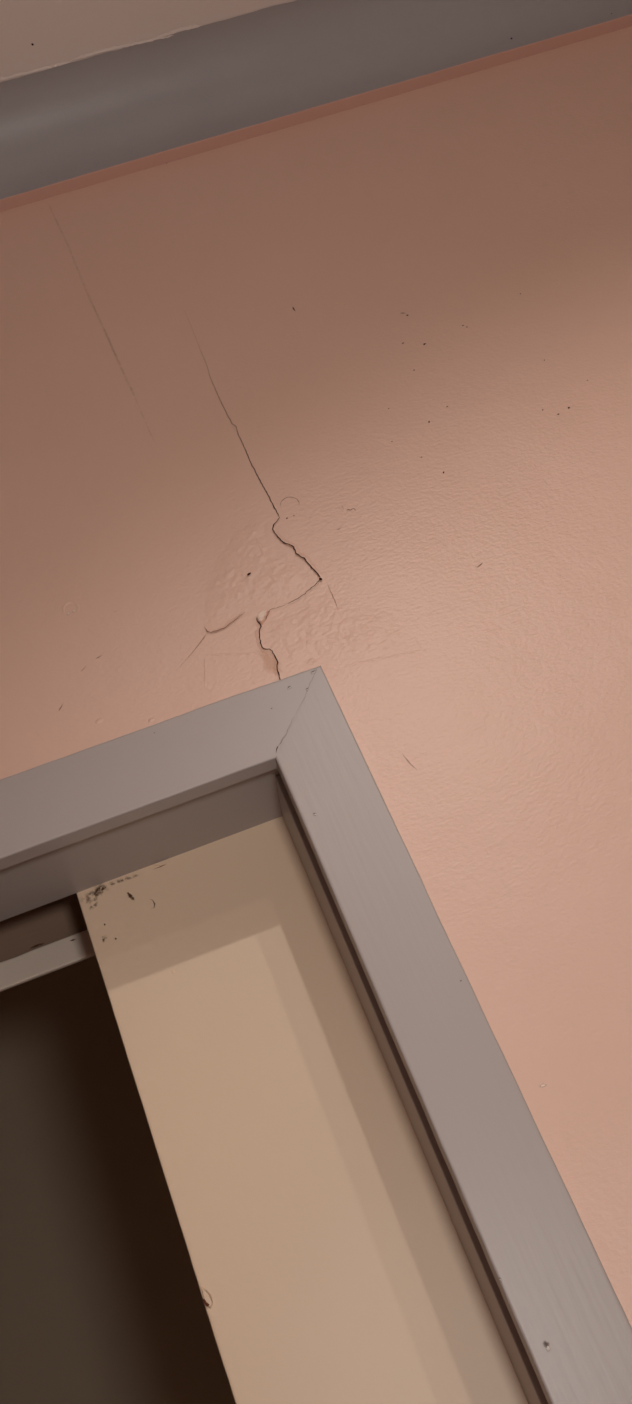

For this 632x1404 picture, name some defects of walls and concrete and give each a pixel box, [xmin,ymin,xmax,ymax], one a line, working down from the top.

crack [199,398,323,681]